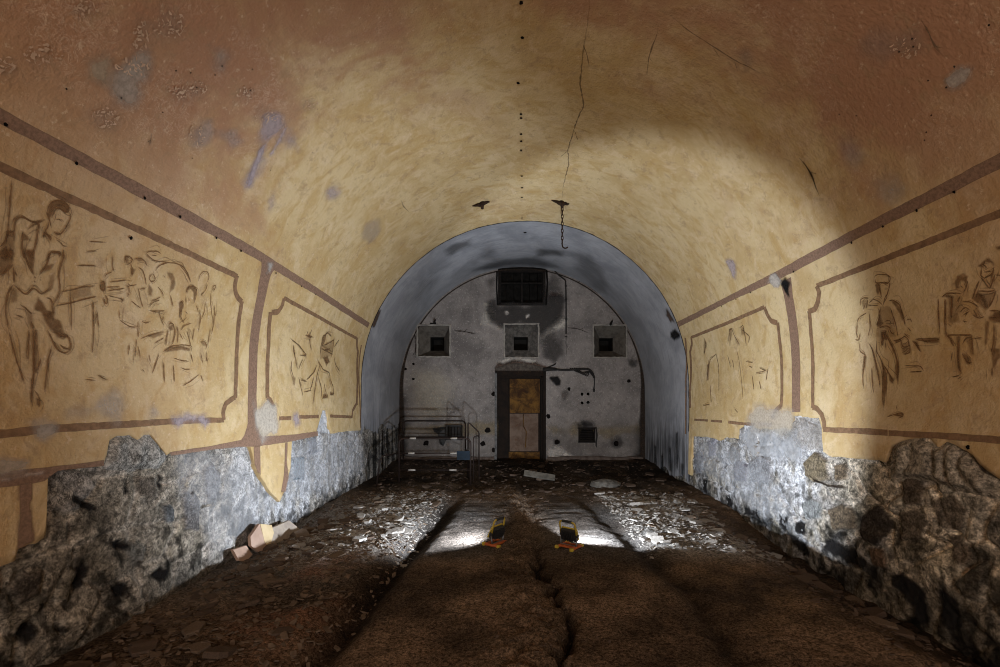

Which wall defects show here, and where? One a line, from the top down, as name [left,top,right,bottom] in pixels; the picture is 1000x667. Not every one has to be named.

crack [563,50,589,175]
leakage [484,294,565,361]